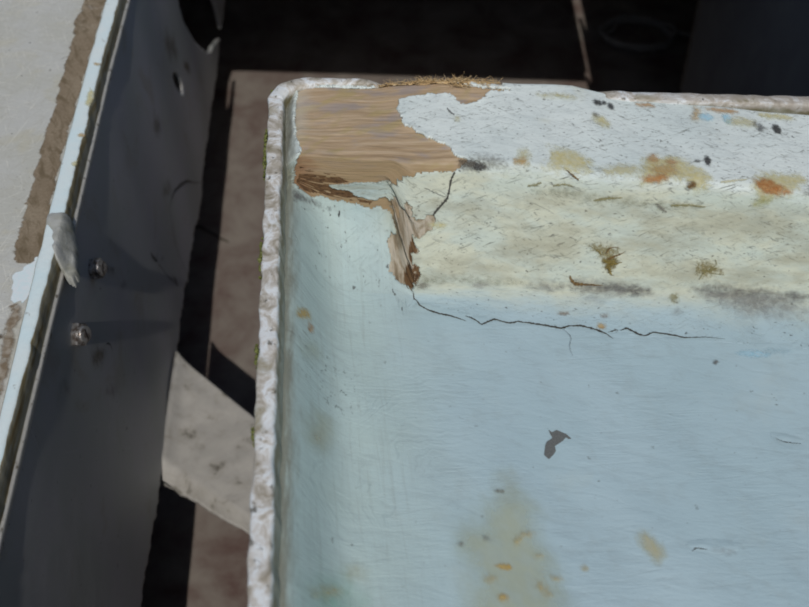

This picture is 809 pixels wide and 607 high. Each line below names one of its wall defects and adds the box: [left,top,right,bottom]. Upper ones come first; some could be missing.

peeling [294,74,510,290]
crack [424,172,455,215]
corrosion [551,150,589,181]
corrosion [605,155,710,189]
corrosion [755,174,805,200]
crack [413,293,721,351]
peeling [544,430,571,459]